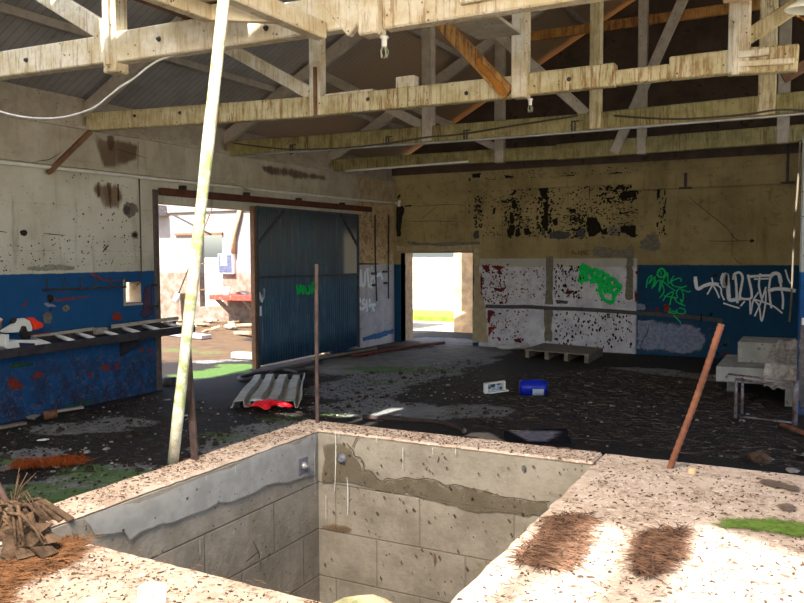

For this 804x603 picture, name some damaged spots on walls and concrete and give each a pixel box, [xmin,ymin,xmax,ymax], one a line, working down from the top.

peeling [468,184,641,240]
peeling [656,189,667,236]
peeling [480,263,729,469]
damp [322,435,550,516]